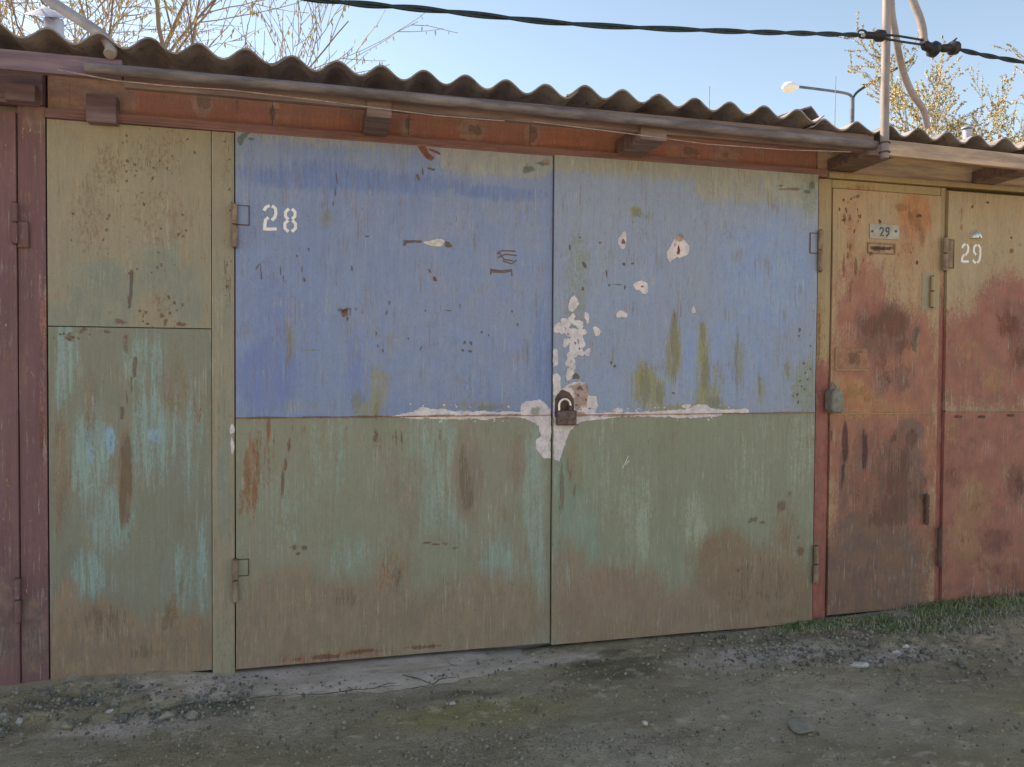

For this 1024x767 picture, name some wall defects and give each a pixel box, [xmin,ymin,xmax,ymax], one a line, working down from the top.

corrosion [417,146,441,171]
peeling [667,236,690,262]
peeling [633,280,648,294]
peeling [395,295,749,461]
corrosion [831,423,848,487]